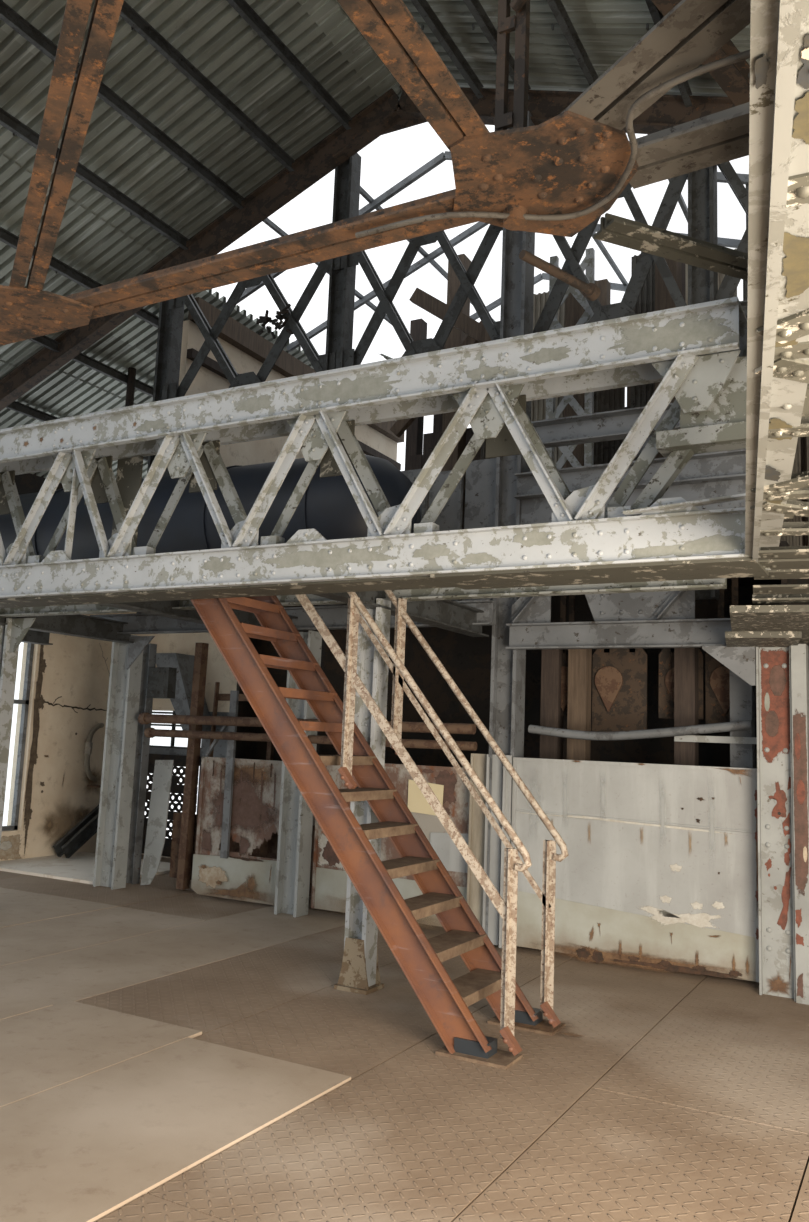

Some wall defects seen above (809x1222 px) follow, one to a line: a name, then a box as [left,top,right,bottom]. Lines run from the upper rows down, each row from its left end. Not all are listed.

peeling [792,34,809,145]
peeling [782,232,809,298]
peeling [610,315,734,355]
peeling [520,345,573,365]
peeling [769,418,793,440]
peeling [765,466,781,481]
peeling [262,545,397,569]
peeling [412,544,496,565]
peeling [628,534,744,560]
peeling [760,648,809,946]
peeling [640,895,725,928]
rust [554,923,749,979]